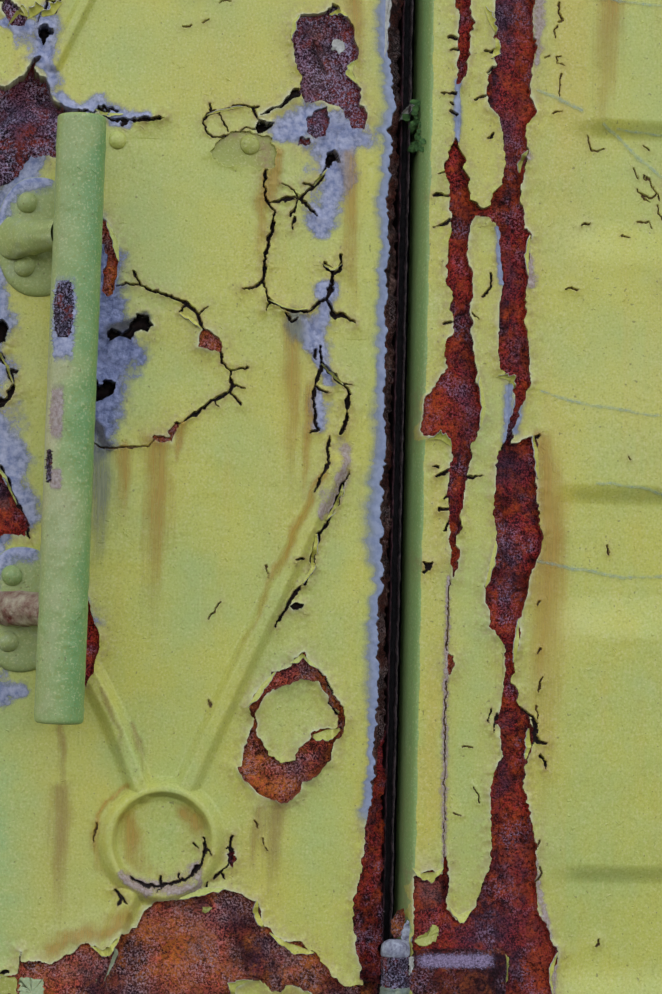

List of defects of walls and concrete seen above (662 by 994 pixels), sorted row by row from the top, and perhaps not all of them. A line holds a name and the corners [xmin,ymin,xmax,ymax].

rust [0,49,80,190]
rust [286,0,373,146]
peeling [0,411,42,528]
peeling [51,280,77,358]
peeling [94,244,158,451]
crack [176,351,249,424]
crack [242,165,356,323]
crack [275,346,351,628]
peeling [253,0,415,818]
rust [404,0,566,994]
crack [114,835,237,906]
rust [0,730,387,994]